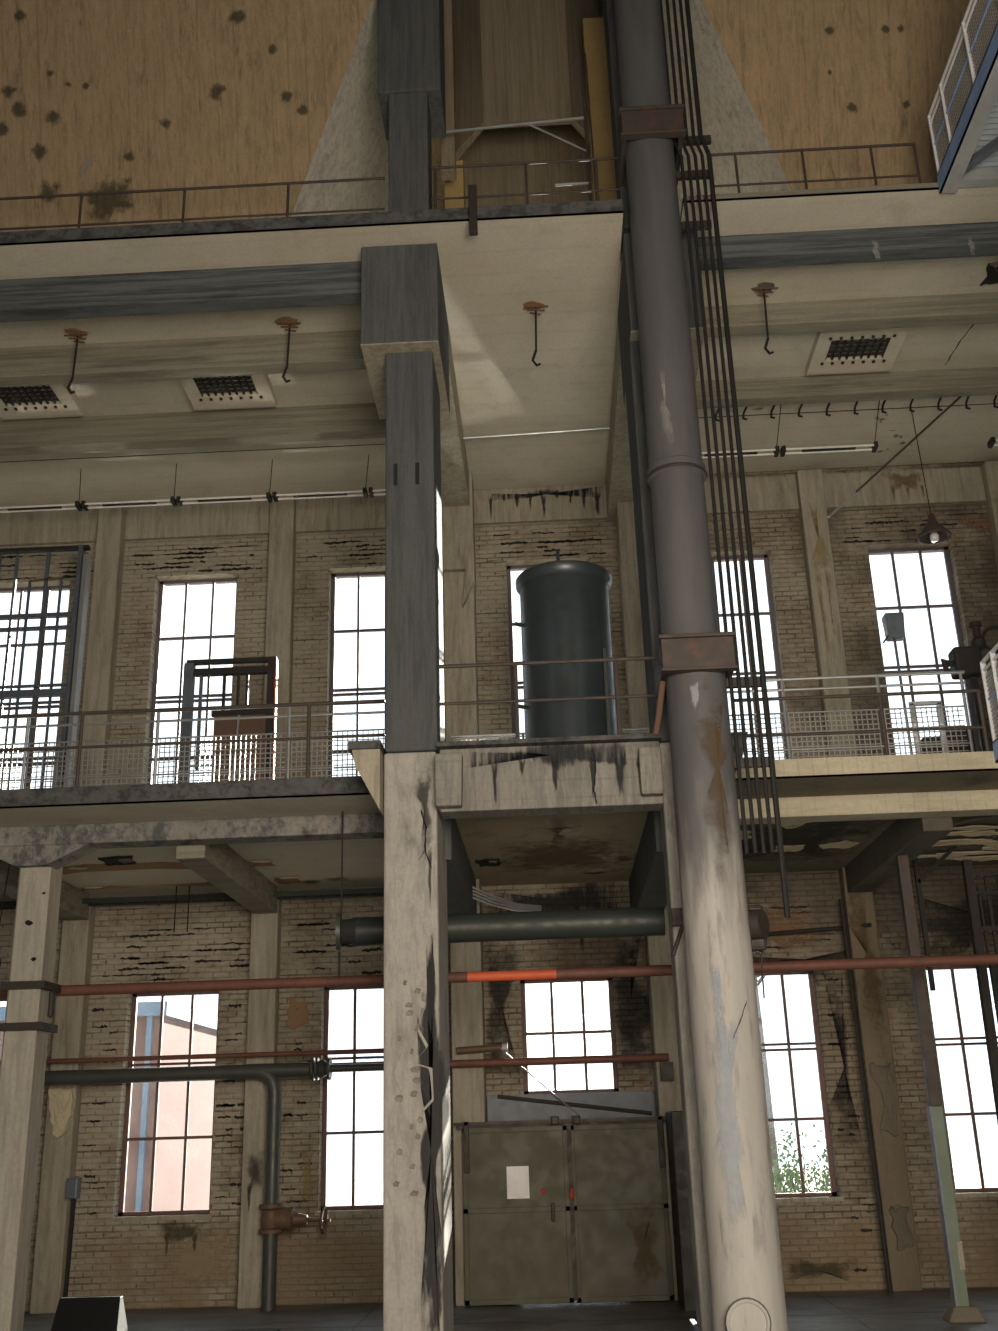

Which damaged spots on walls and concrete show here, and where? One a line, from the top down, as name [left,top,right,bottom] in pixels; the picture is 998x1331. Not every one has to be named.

damp [0,86,25,135]
damp [212,86,226,99]
damp [283,92,307,114]
damp [88,180,132,220]
damp [489,487,600,514]
damp [474,743,640,799]
peeling [774,840,859,852]
peeling [917,815,998,862]